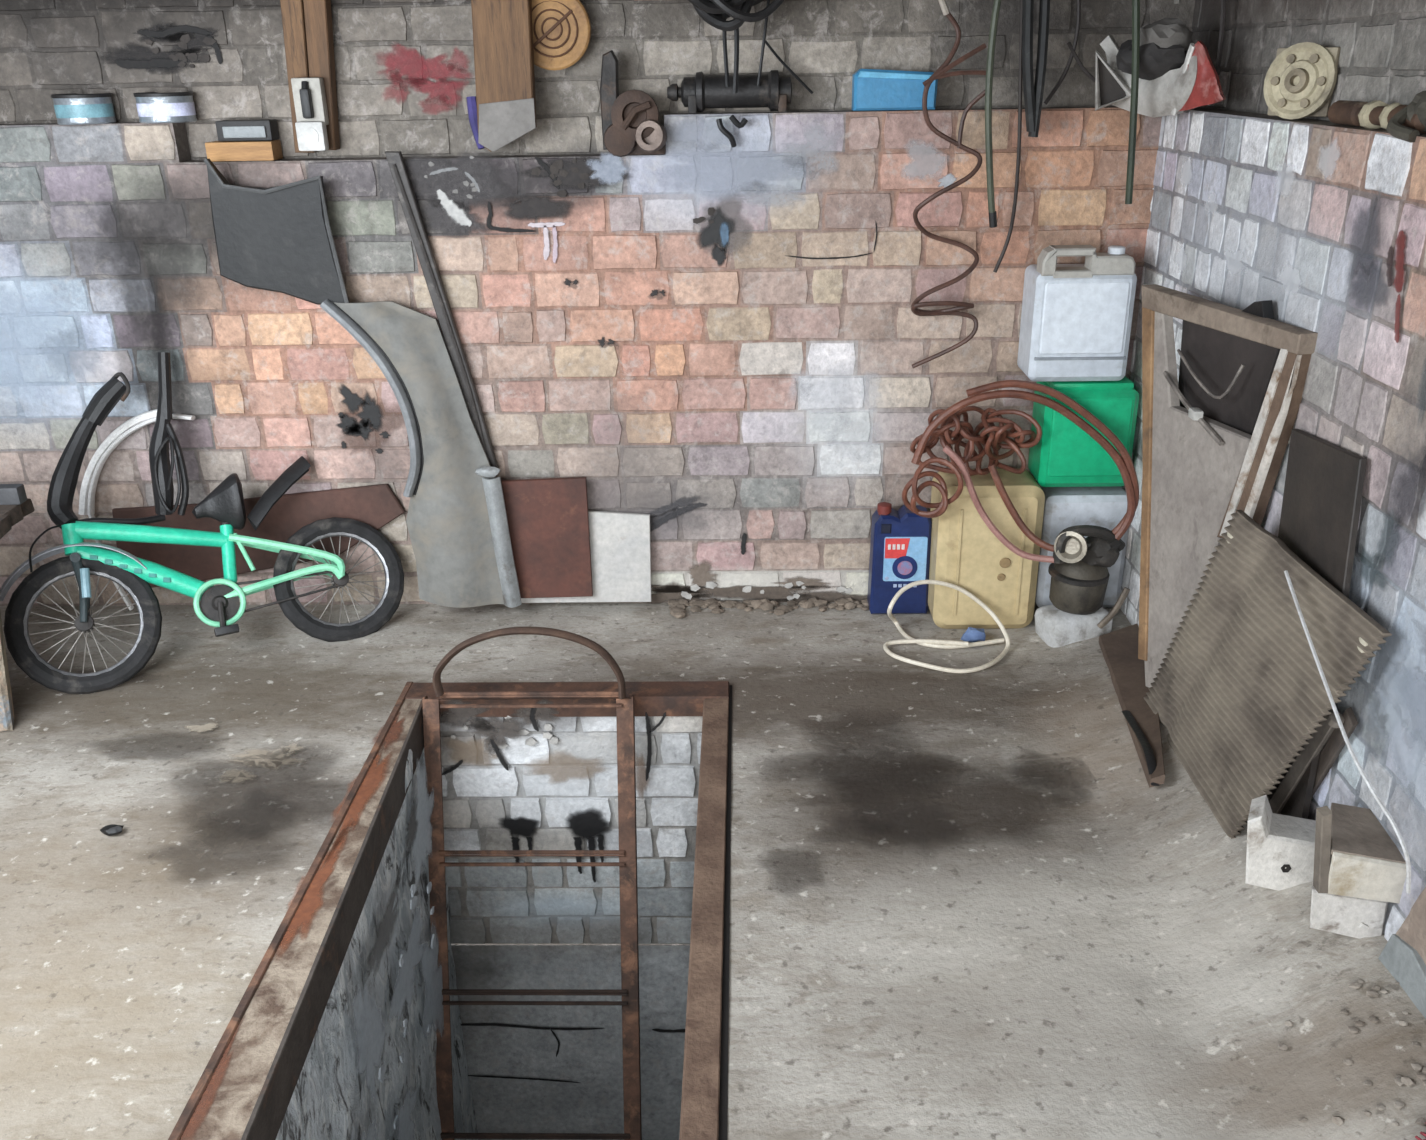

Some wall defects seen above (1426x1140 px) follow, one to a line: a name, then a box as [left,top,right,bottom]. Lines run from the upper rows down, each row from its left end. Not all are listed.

rust [535,756,599,781]
rust [279,716,404,950]
rust [180,1029,238,1140]